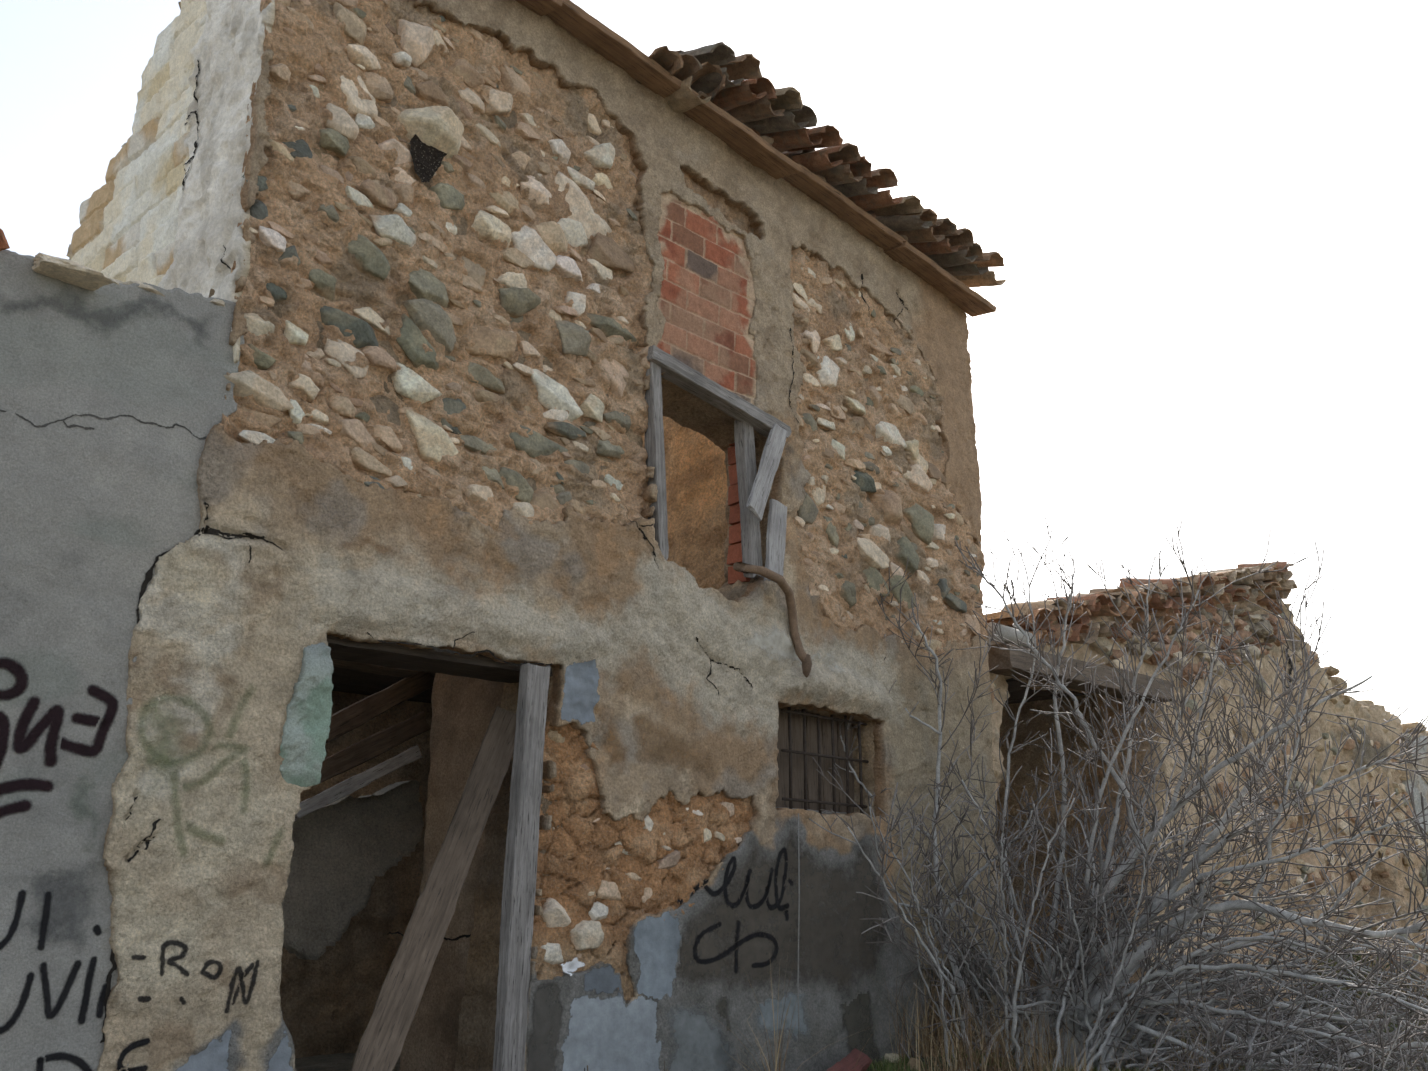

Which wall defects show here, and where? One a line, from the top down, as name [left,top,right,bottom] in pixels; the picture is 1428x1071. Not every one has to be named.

crack [182,60,200,190]
spalling [219,0,654,529]
crack [0,409,207,440]
spalling [789,247,988,658]
crack [136,502,282,624]
peeling [279,642,334,787]
crack [696,637,752,697]
spalling [531,659,753,1071]
peeling [176,1030,232,1071]
peeling [266,1030,293,1071]